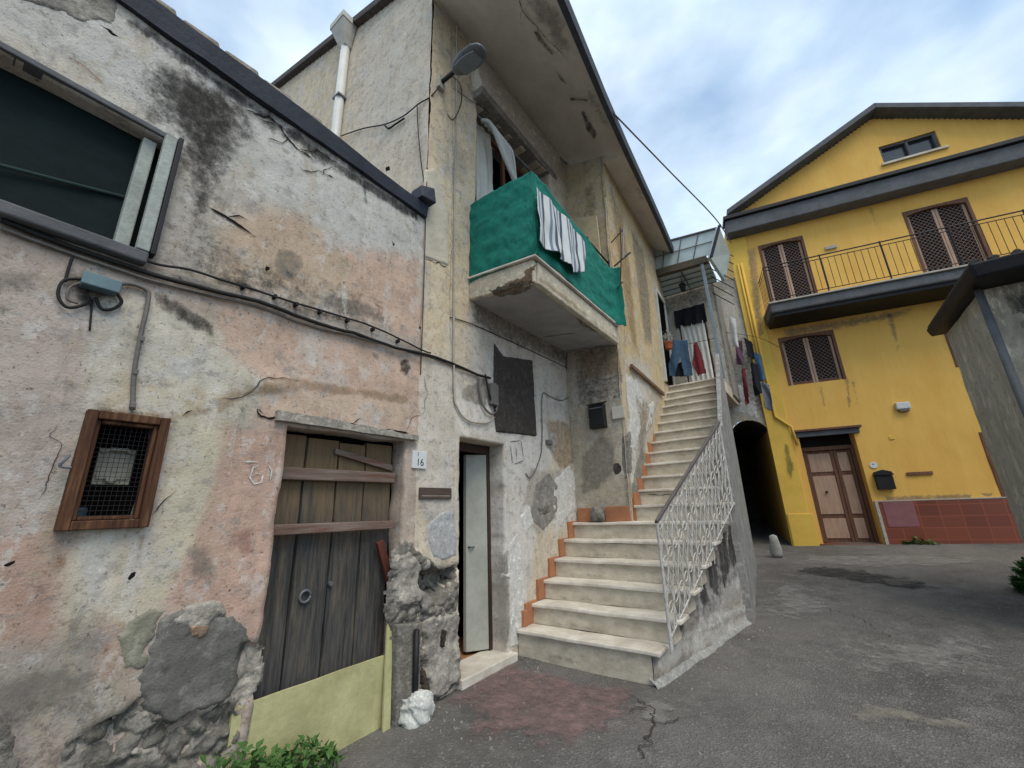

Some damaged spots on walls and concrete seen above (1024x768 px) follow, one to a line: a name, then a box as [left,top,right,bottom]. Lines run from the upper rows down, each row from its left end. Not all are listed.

damp [164,51,417,219]
crack [248,110,336,178]
crack [211,208,251,234]
spalling [489,265,536,297]
crack [39,424,62,499]
crack [221,377,298,420]
crack [351,378,428,434]
peeling [613,374,654,493]
flaking render [174,600,226,638]
spalling [383,509,461,701]
damp [673,526,746,647]
spalling [58,640,265,768]